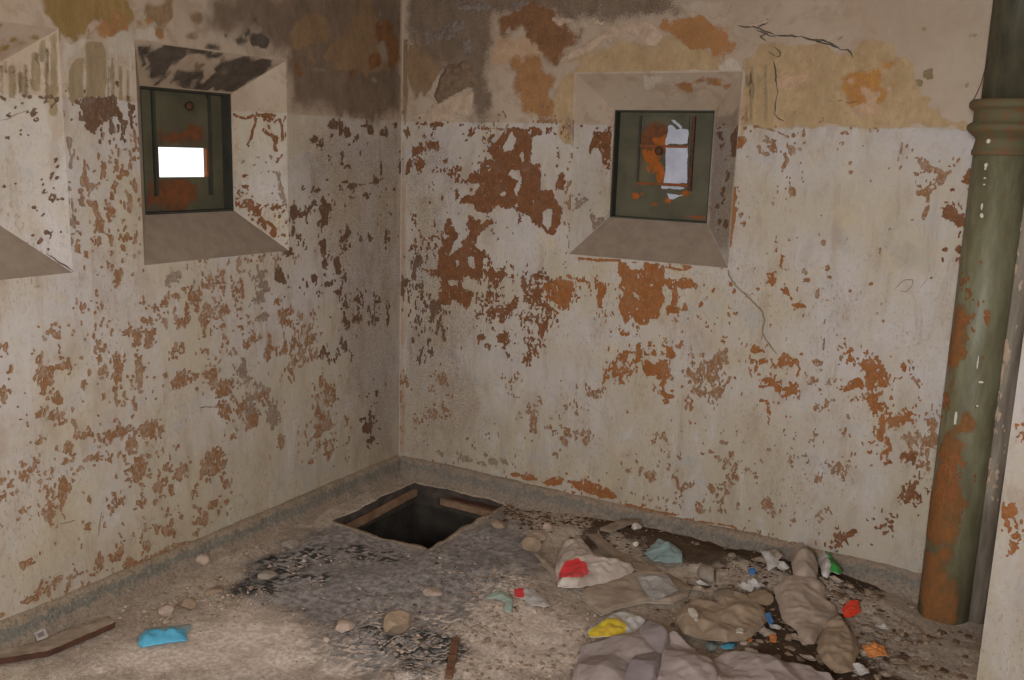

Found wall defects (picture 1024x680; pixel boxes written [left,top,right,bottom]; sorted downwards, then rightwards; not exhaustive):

water stain [0,0,683,128]
crack [738,23,853,121]
peeling [916,68,933,87]
peeling [0,79,941,604]
crack [728,270,777,354]
corrosion [920,258,990,625]